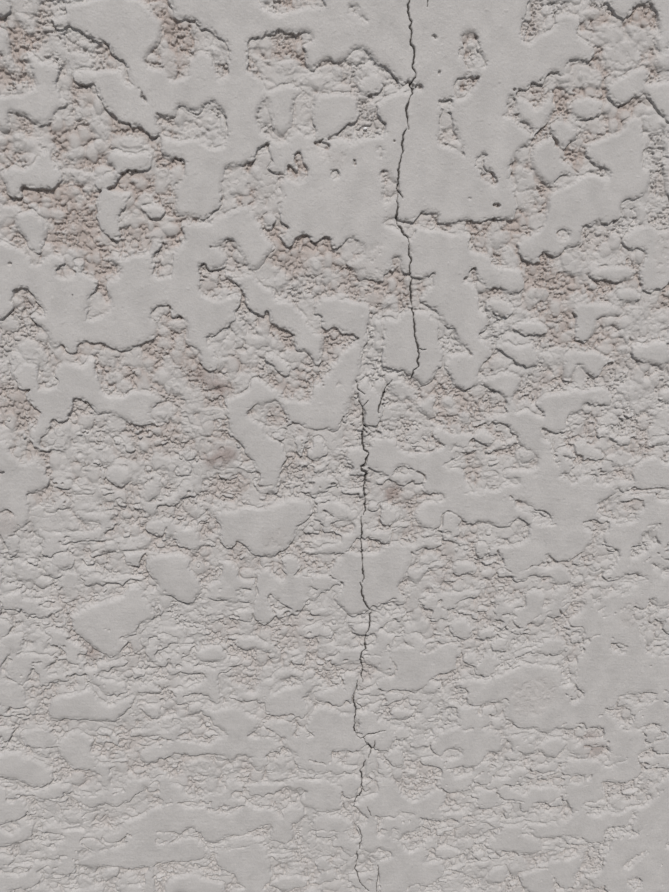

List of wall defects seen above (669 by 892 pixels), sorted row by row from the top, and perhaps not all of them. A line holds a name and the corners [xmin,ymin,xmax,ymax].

crack [353,0,428,892]